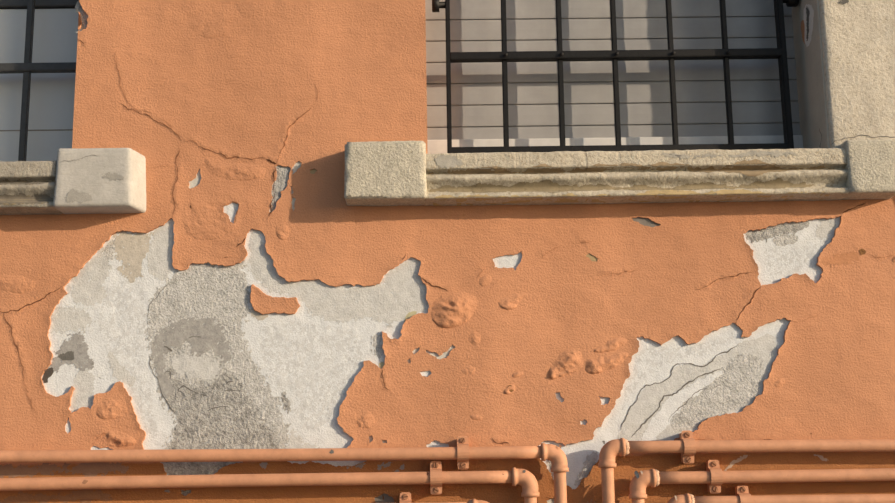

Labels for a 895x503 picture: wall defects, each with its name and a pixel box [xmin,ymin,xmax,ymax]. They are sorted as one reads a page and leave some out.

crack [115,51,318,217]
peeling [269,162,317,212]
peeling [492,251,522,270]
crack [696,272,759,319]
peeling [743,217,840,286]
crack [0,286,62,413]
peeling [42,219,429,469]
peeling [539,318,791,489]
crack [619,345,738,436]
peeling [161,461,269,475]